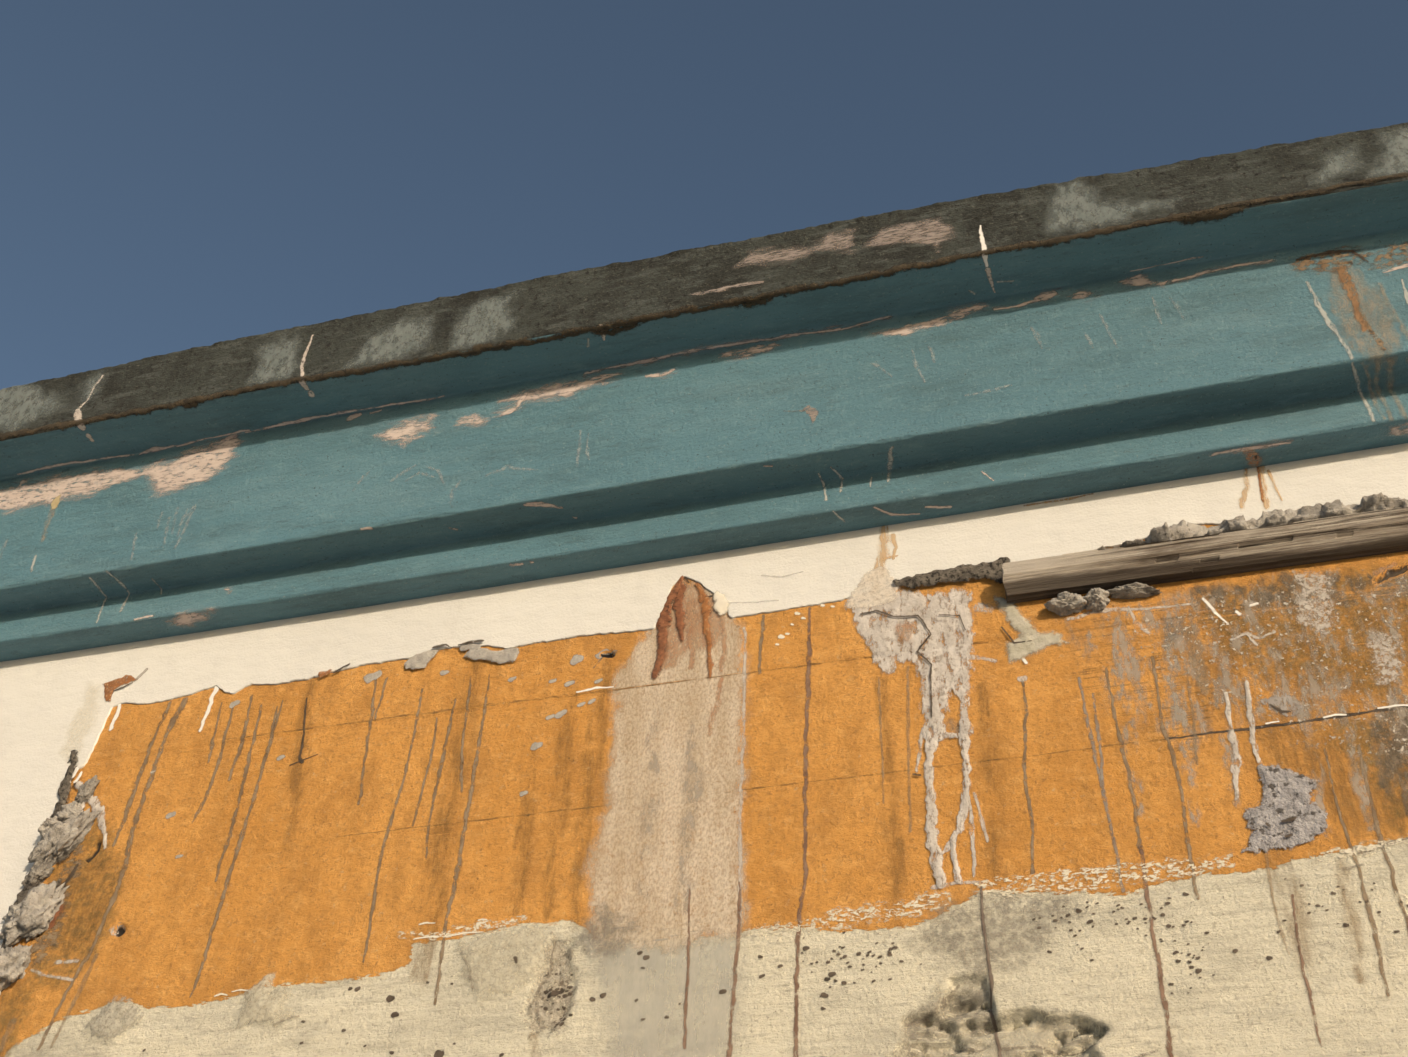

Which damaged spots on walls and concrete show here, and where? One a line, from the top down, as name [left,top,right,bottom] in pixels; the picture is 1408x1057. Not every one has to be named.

corrosion [1290,243,1408,422]
peeling [0,395,445,513]
spalling [404,640,519,695]
corrosion [651,575,729,735]
spalling [50,750,85,818]
peeling [396,905,531,940]
spalling [521,938,606,1037]
damp [581,584,765,1057]
peeling [747,891,951,1010]
damp [845,578,1069,889]
spalling [905,972,1108,1057]
spalling [974,763,1406,994]